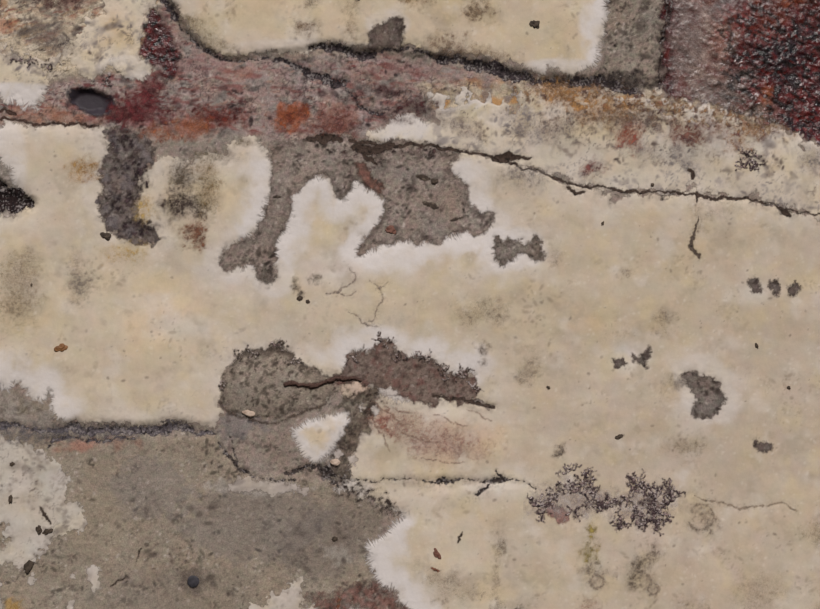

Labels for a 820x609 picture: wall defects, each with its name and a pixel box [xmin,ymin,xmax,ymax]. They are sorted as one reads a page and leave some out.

corrosion [106,76,236,140]
crack [160,0,673,116]
flaking render [363,0,820,221]
corrosion [514,80,774,149]
crack [0,180,35,213]
peeling [95,126,160,248]
peeling [219,131,494,282]
crack [306,133,820,259]
peeling [332,341,477,407]
flaking render [0,433,88,586]
crack [0,419,536,496]
flaking render [291,387,379,478]